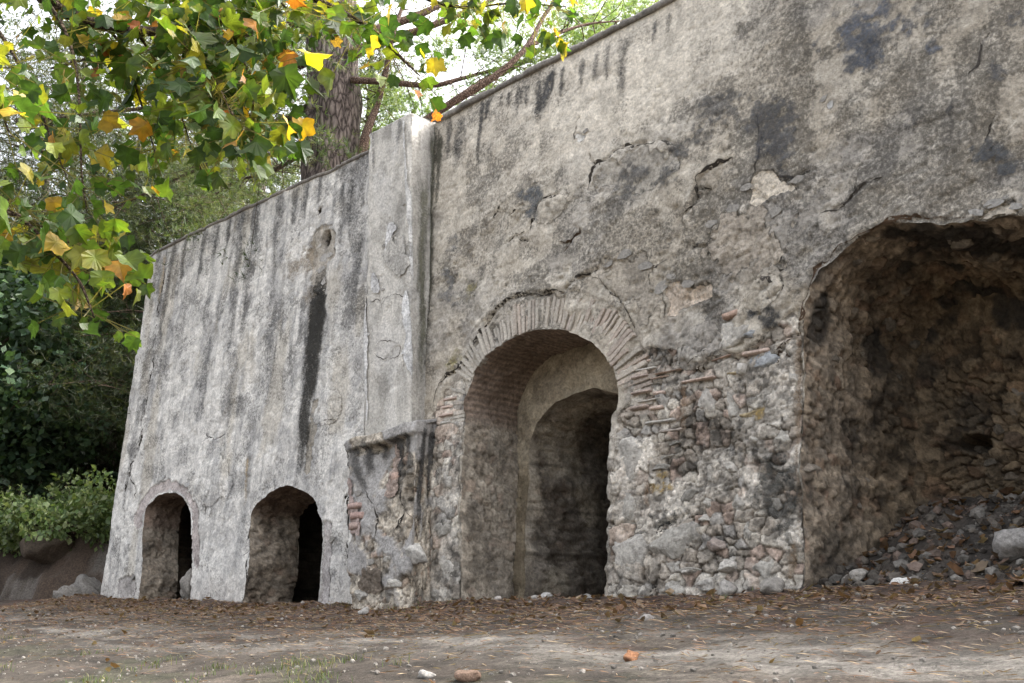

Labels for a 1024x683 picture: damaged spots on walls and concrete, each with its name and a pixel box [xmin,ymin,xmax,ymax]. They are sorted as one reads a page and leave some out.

leakage [579,38,629,89]
leakage [837,0,929,73]
leakage [476,66,564,160]
crack [588,139,674,187]
leakage [617,88,796,200]
crack [682,125,817,258]
crack [821,176,882,213]
spalling [654,170,804,316]
leakage [296,275,327,472]
spalling [607,309,805,598]
spalling [347,478,364,536]
spalling [354,554,402,602]